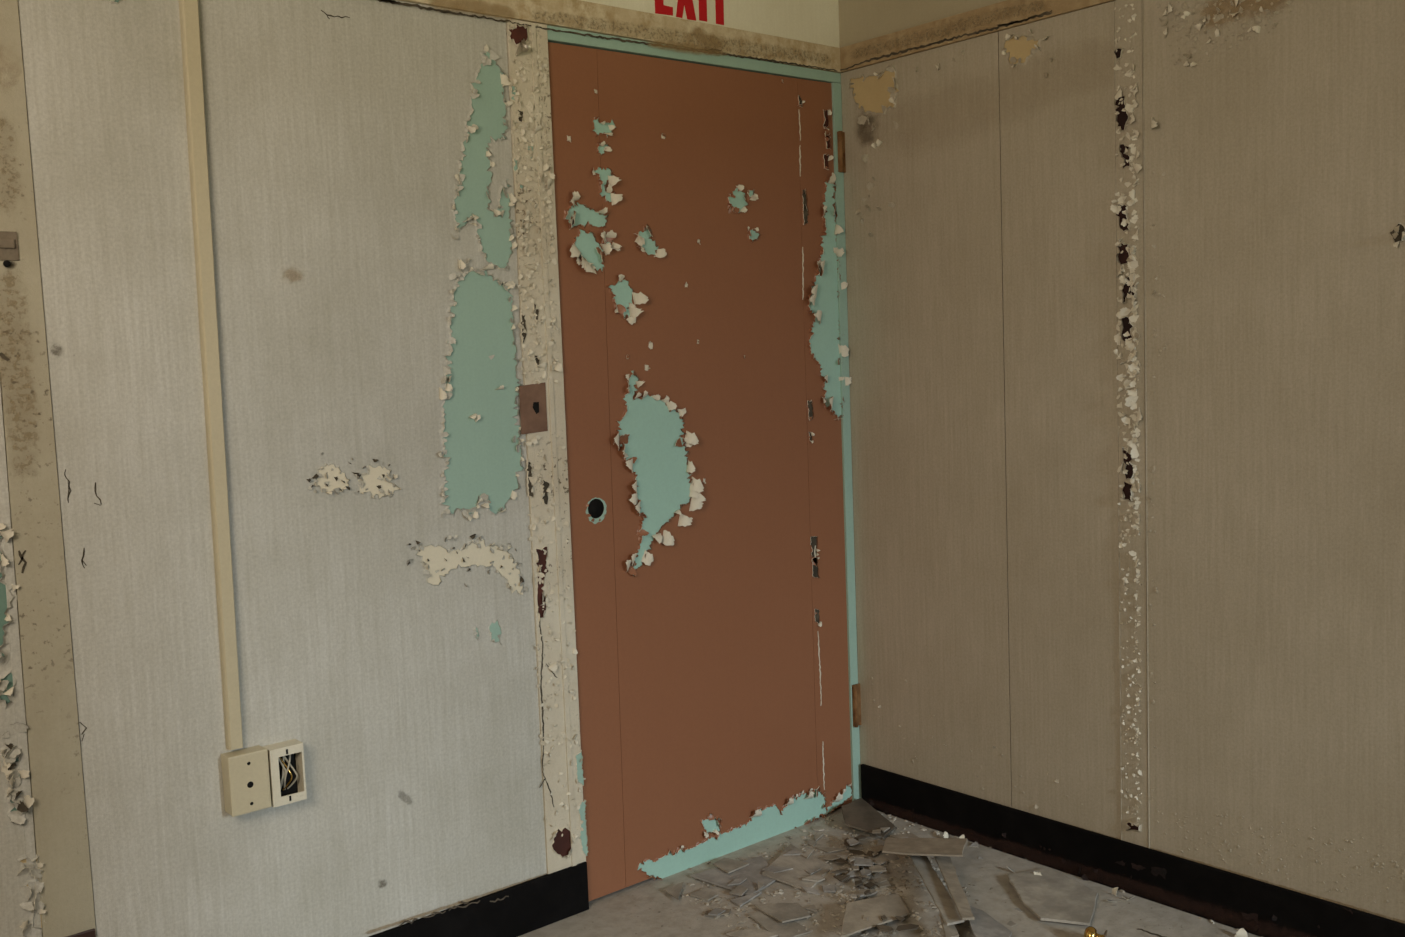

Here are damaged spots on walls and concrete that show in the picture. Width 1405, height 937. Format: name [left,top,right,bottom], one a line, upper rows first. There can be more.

peeling [849,64,900,164]
peeling [806,173,852,421]
peeling [307,452,401,500]
peeling [406,24,667,859]
peeling [613,341,706,577]
peeling [1110,4,1158,832]
peeling [0,523,35,825]
peeling [15,854,47,937]
peeling [636,783,853,880]
peeling [869,799,1320,937]